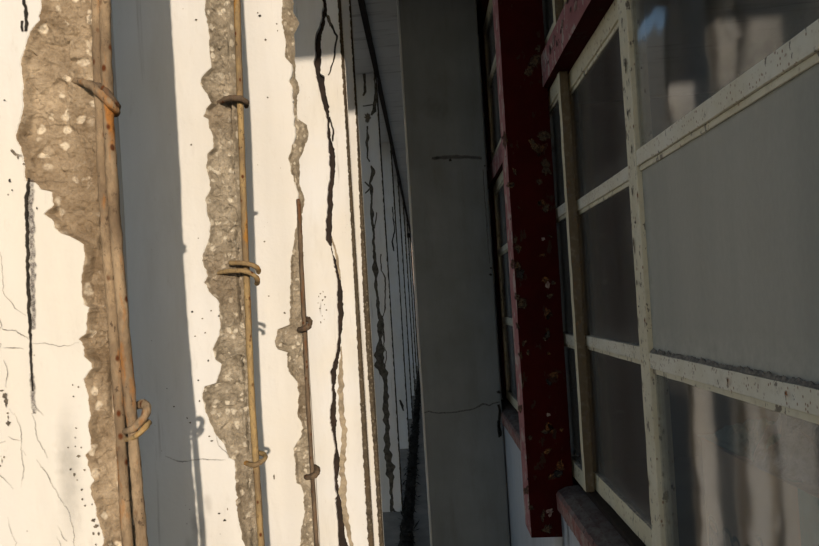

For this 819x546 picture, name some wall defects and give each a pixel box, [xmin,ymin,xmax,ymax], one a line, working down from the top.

crack [0,373,11,426]
crack [0,178,33,391]
crack [20,0,28,31]
spalling [11,0,149,546]
spalling [195,0,265,546]
spalling [275,0,320,546]
crack [314,0,348,546]